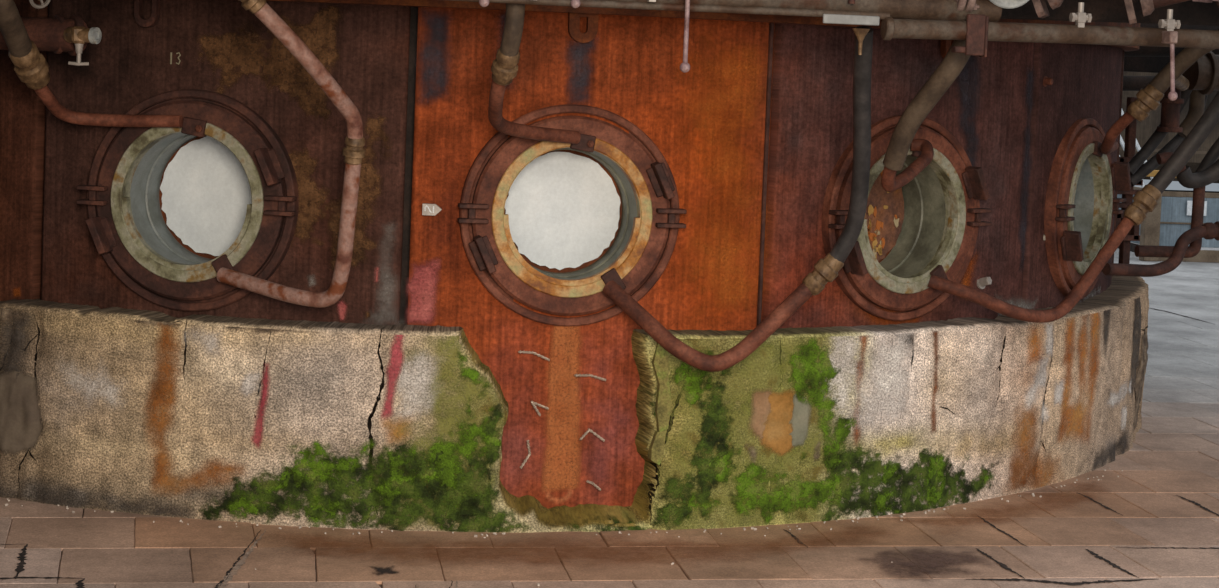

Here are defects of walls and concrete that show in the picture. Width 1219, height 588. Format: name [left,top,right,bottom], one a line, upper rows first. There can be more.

corrosion [147,326,235,487]
crack [366,329,385,527]
leakage [399,357,430,415]
spalling [460,330,509,422]
spalling [499,442,649,527]
crack [647,374,689,526]
leakage [829,336,856,409]
leakage [862,334,912,419]
corrosion [1030,332,1040,359]
corrosion [1060,312,1099,438]
leakage [1093,296,1142,471]